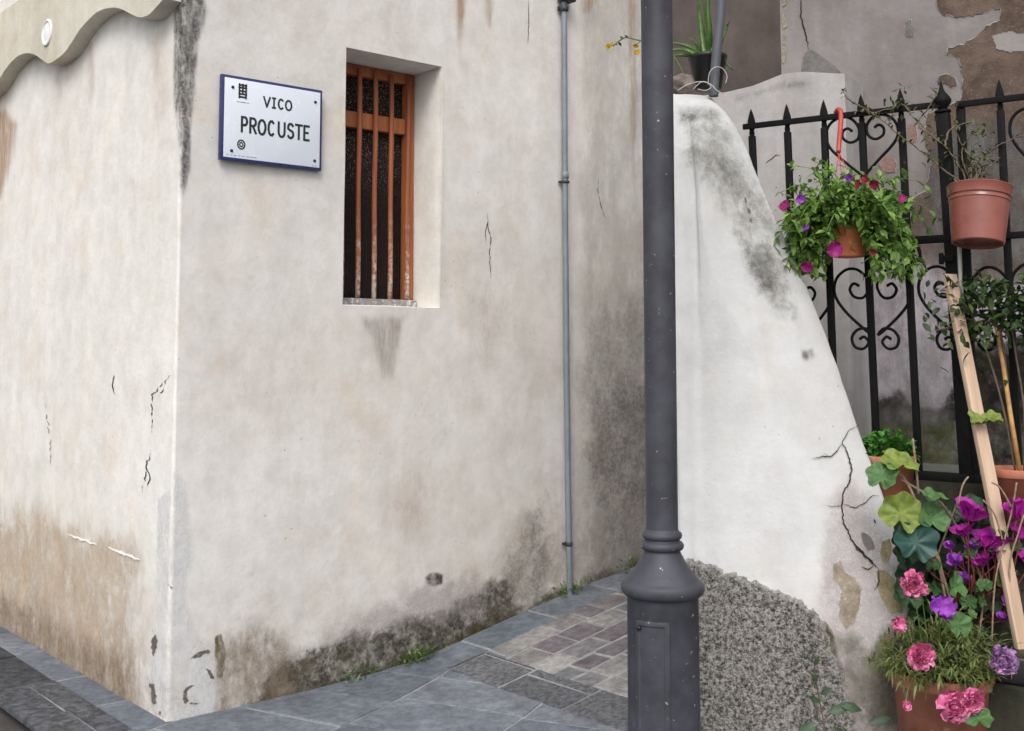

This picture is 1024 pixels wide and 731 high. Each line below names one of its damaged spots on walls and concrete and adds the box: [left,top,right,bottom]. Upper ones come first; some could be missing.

water stain [174,0,205,183]
water stain [750,245,787,293]
crack [800,1,808,47]
flaking render [908,111,946,277]
flaking render [935,0,1024,240]
flaking render [962,252,1024,285]
water stain [0,516,135,701]
crack [142,375,171,486]
water stain [234,524,547,704]
flaking render [831,559,861,631]
crack [813,425,882,590]
flaking render [860,532,903,614]